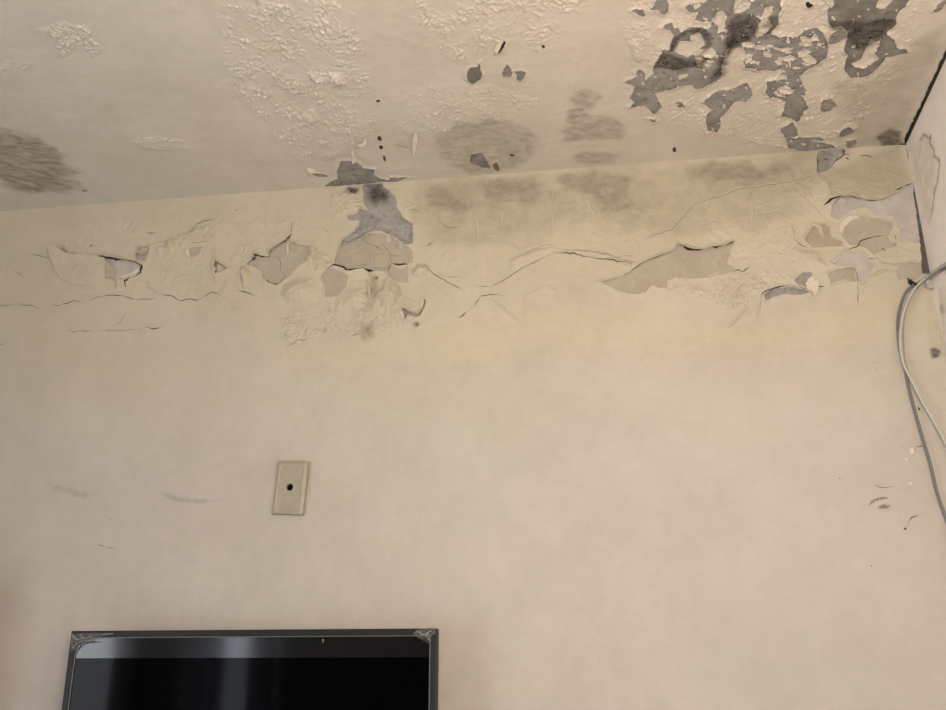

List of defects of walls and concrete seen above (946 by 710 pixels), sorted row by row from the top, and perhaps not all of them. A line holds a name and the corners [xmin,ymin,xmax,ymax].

peeling [927,0,946,14]
spalling [619,0,914,177]
crack [0,221,292,333]
spalling [209,149,419,303]
peeling [397,295,430,331]
crack [327,223,735,317]
peeling [592,237,743,302]
crack [760,282,824,297]
peeling [759,177,928,307]
crack [832,233,896,303]